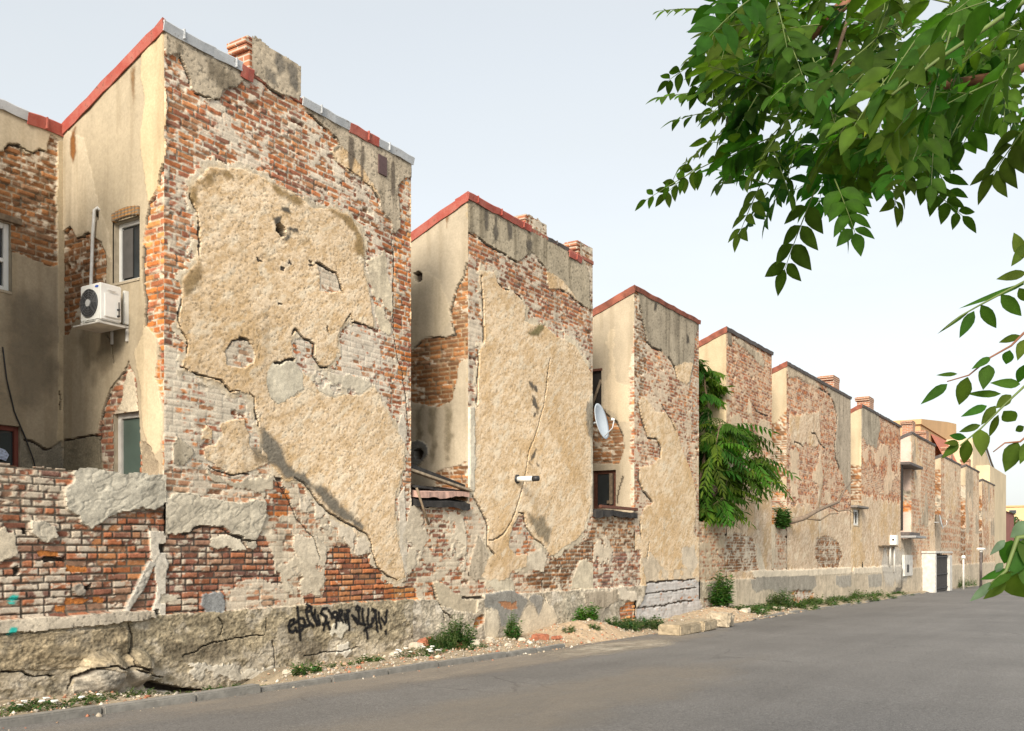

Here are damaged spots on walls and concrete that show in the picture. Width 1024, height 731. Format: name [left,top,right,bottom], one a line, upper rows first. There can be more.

damp [269,53,297,89]
spalling [0,134,107,335]
damp [485,209,512,240]
spalling [65,48,593,638]
spalling [593,291,726,537]
crack [472,358,551,555]
spalling [724,331,941,586]
flaking render [0,526,19,561]
flaking render [32,520,88,572]
spalling [55,596,104,612]
crack [2,622,164,689]
crack [185,616,276,666]